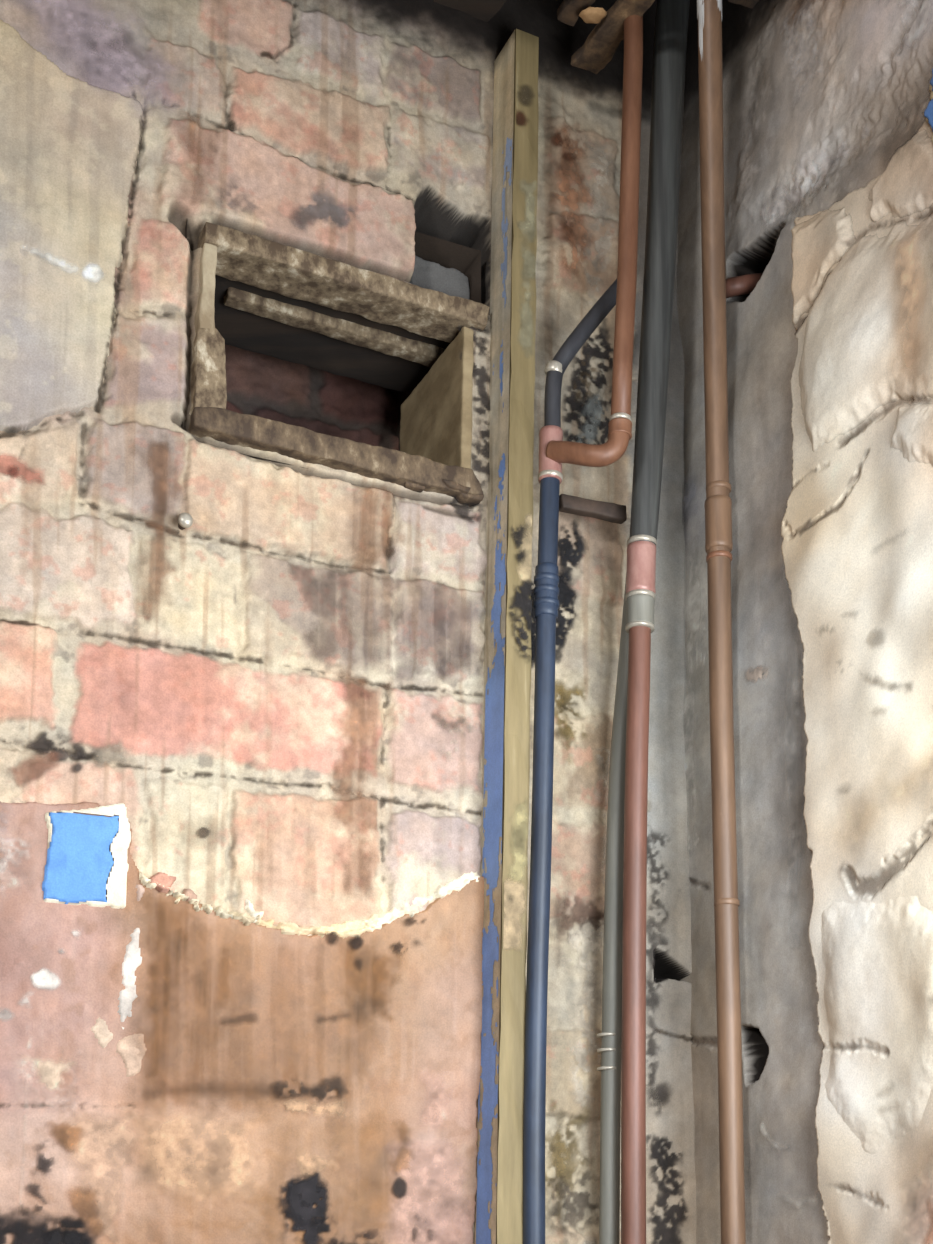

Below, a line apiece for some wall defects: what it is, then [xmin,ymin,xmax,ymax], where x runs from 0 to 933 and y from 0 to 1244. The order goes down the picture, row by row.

crack [217,90,243,135]
crack [0,93,173,441]
leakage [564,320,614,445]
spalling [0,455,43,483]
crack [801,398,922,532]
crack [82,489,393,572]
spalling [14,732,124,785]
peeling [42,803,200,909]
peeling [91,928,147,1077]
leakage [0,1185,101,1244]
leakage [281,1158,344,1244]
leakage [648,1135,687,1244]